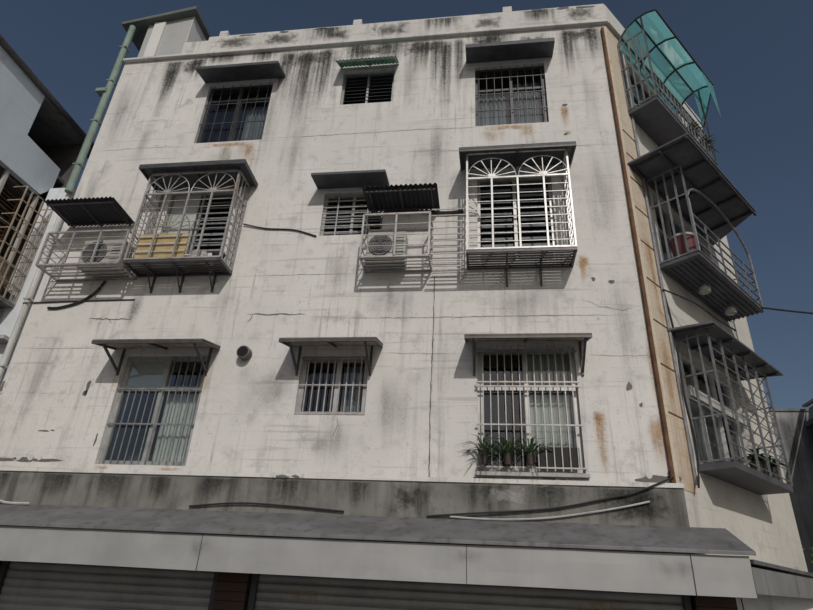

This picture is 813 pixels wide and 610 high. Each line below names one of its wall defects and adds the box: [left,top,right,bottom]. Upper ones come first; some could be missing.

water stain [163,39,244,89]
water stain [279,50,332,91]
water stain [351,43,399,57]
water stain [411,42,462,83]
water stain [562,29,597,55]
crack [233,276,301,327]